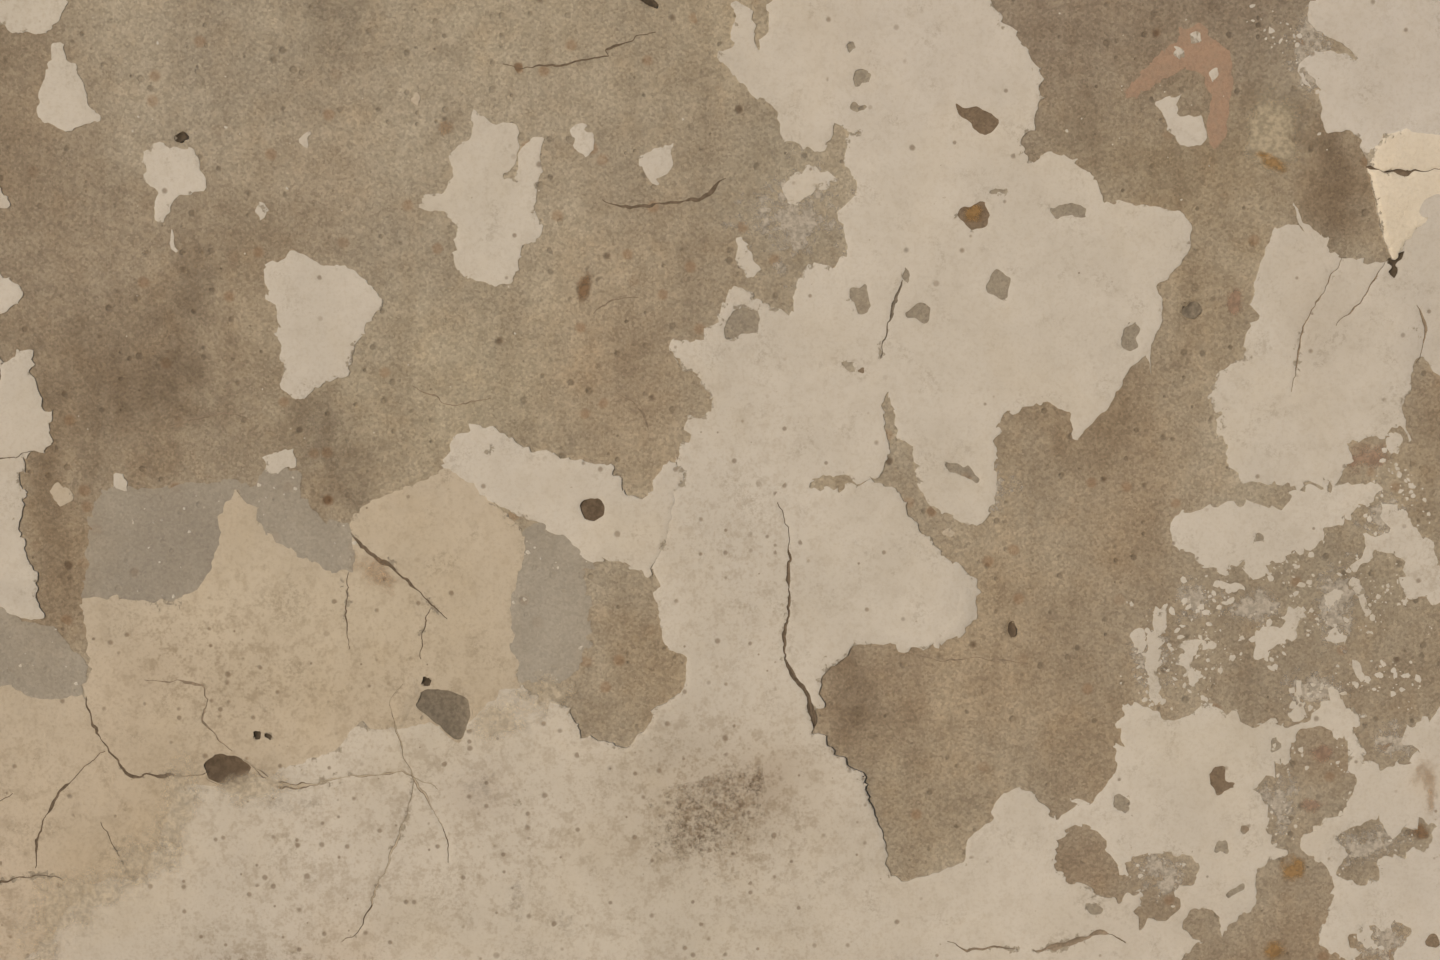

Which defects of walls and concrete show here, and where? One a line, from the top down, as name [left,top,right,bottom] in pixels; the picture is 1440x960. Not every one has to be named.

crack [1366,165,1440,177]
peeling [0,0,855,701]
crack [413,386,490,406]
peeling [811,0,1440,960]
crack [0,534,449,941]
peeling [516,558,687,748]
crack [777,502,817,728]